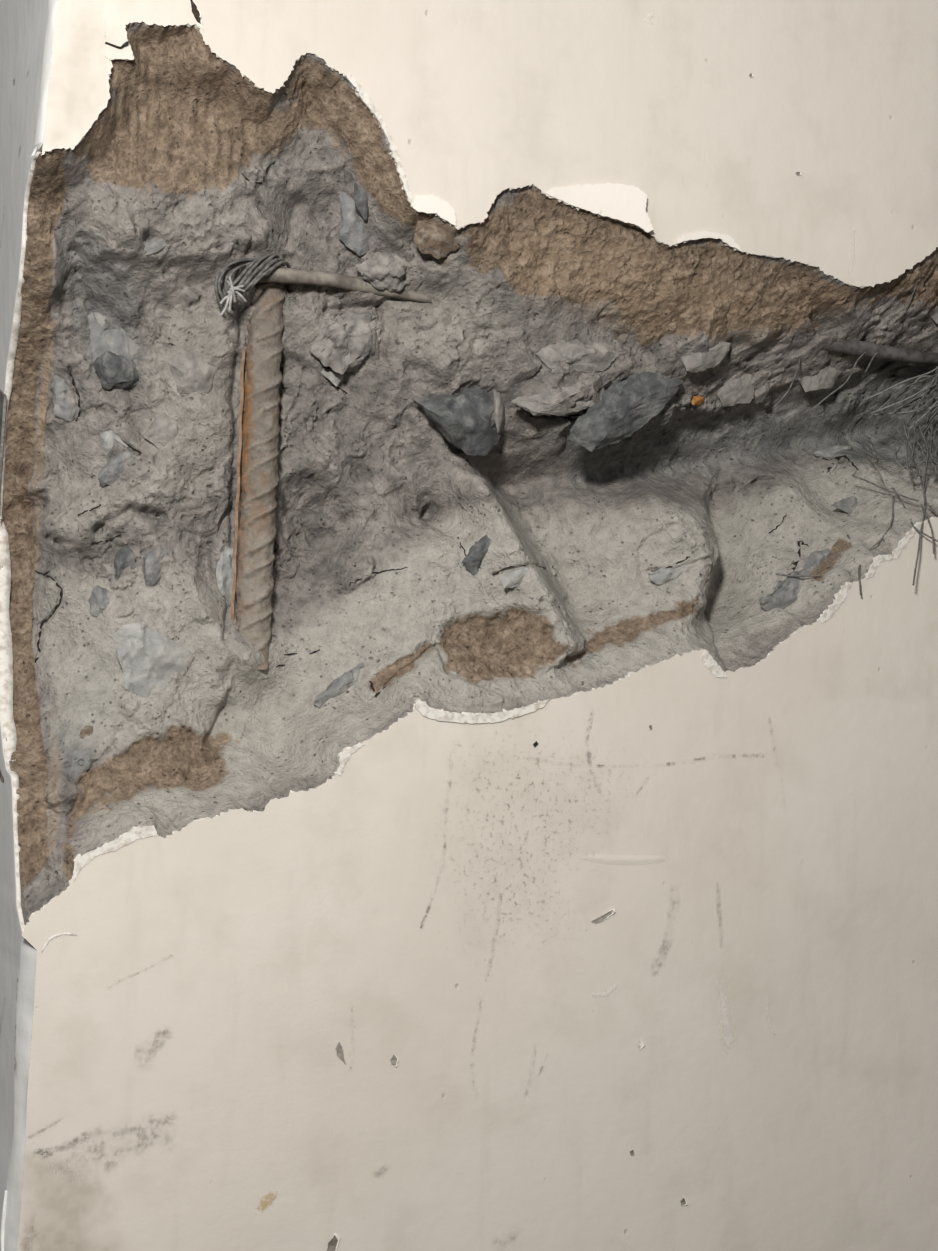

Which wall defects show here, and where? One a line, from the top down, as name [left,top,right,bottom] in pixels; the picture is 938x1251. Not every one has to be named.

spalling [0,0,938,925]